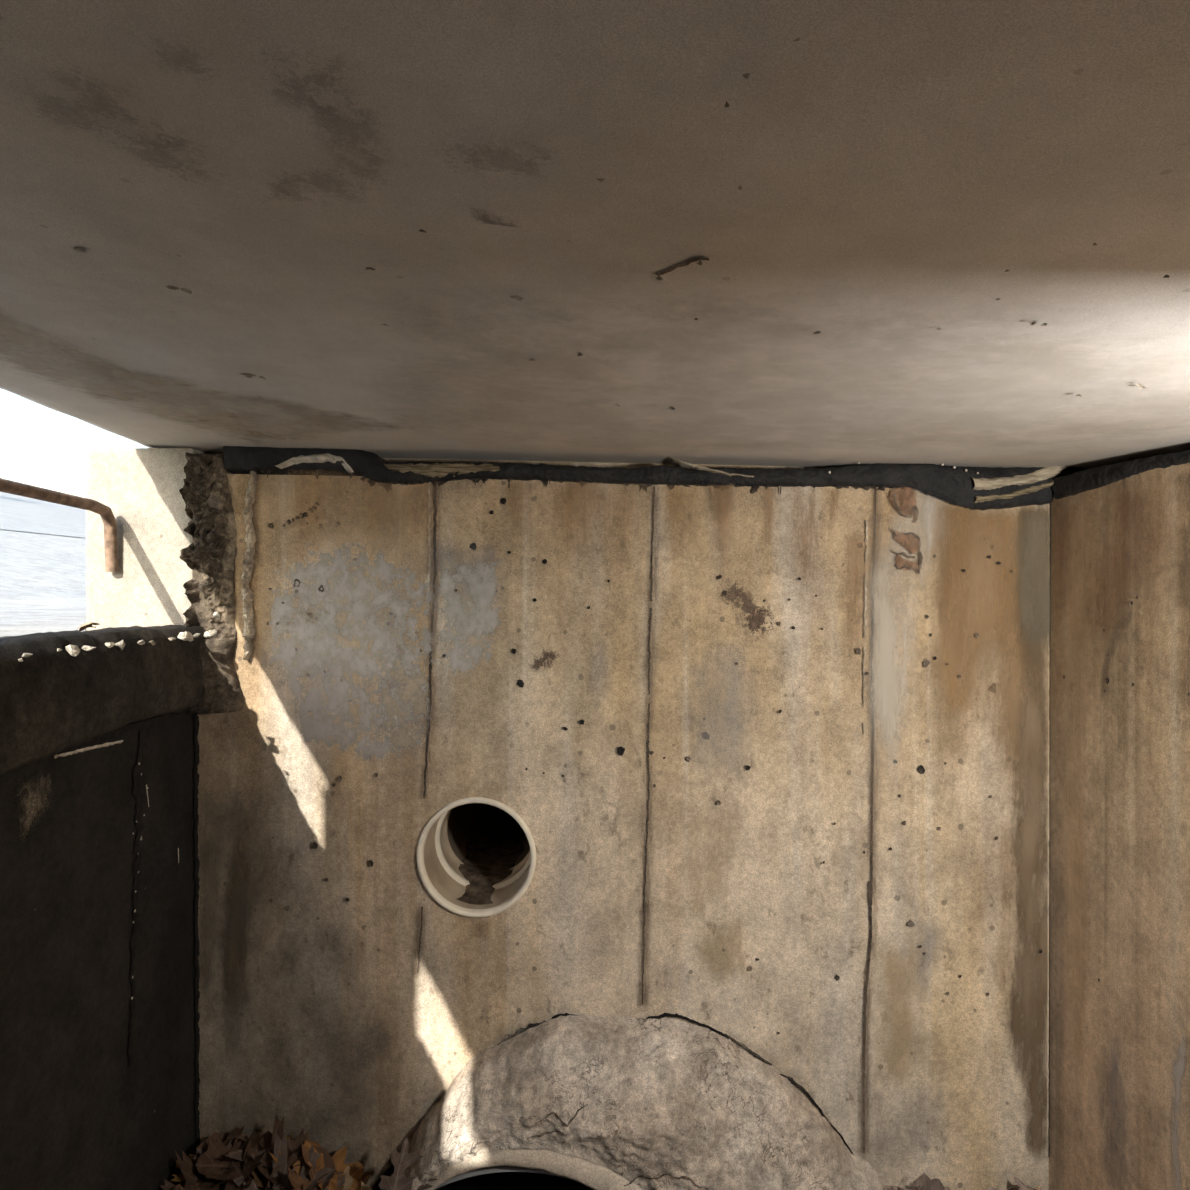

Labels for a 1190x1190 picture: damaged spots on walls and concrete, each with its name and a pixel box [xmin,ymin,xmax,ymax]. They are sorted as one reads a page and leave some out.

crack [629,486,880,1156]
leakage [936,507,1051,1154]
crack [496,1013,579,1046]
crack [529,1104,588,1138]
crack [624,1174,709,1190]